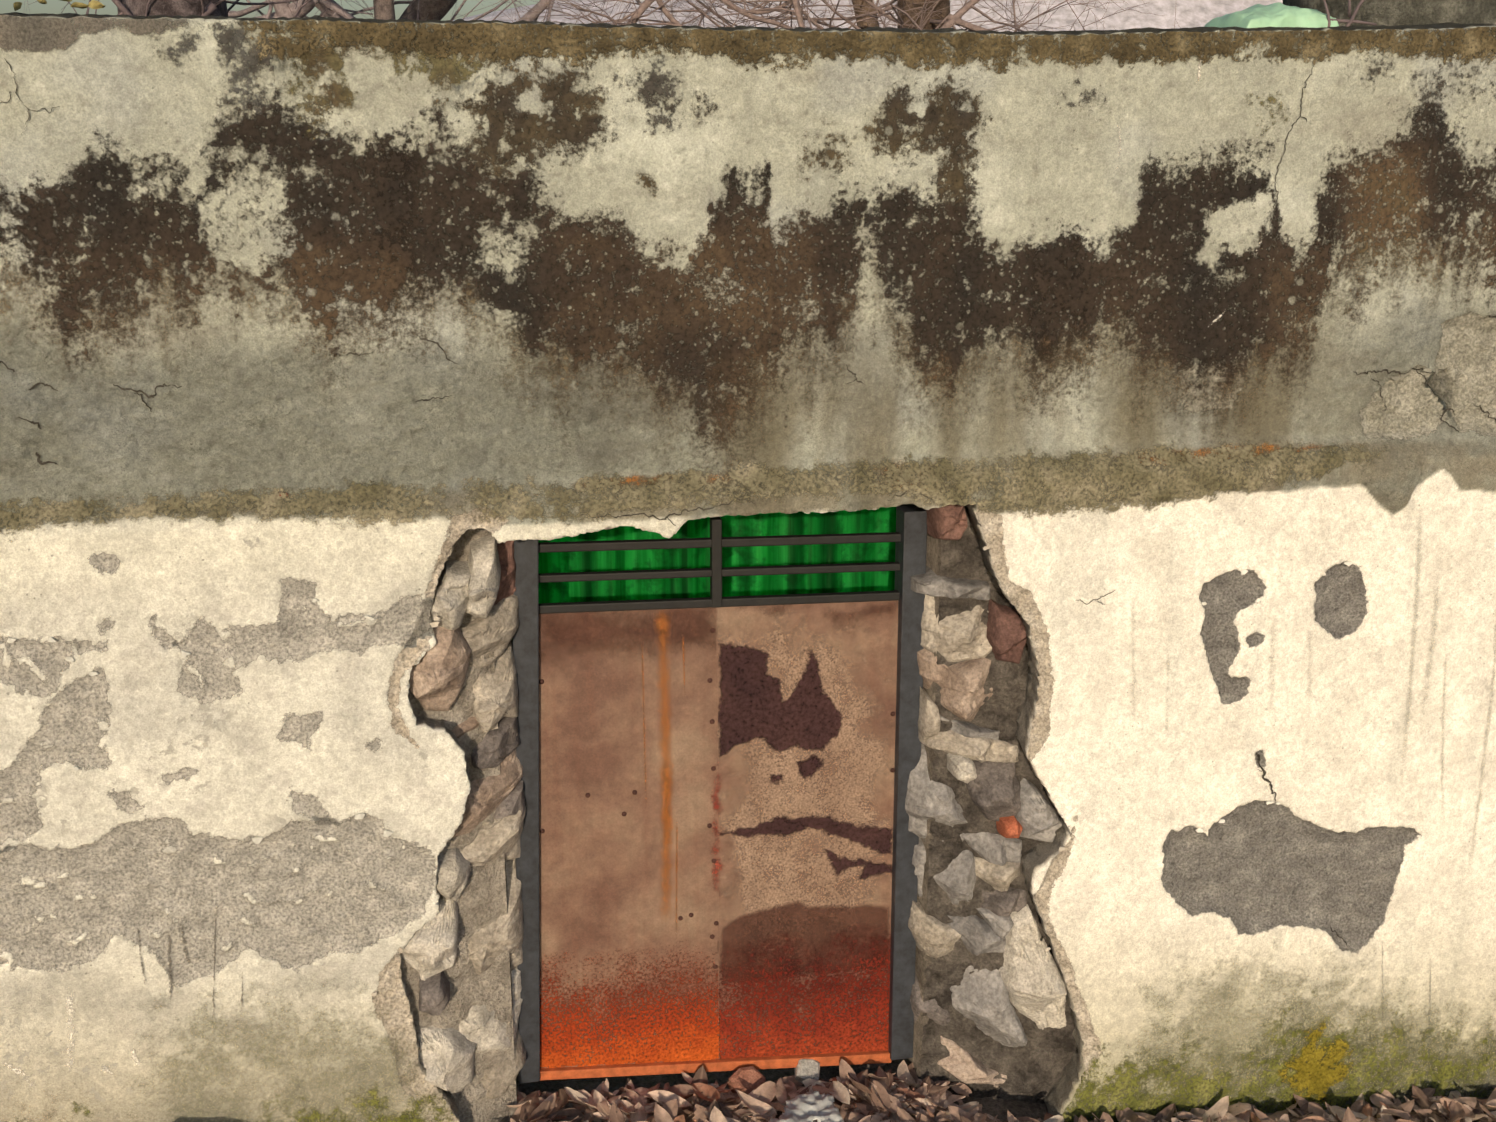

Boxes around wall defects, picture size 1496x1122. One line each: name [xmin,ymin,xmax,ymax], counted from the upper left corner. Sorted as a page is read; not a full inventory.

crack [1271,66,1314,273]
water stain [0,14,1496,486]
crack [1353,368,1496,432]
peeling [148,507,508,752]
spalling [1199,569,1266,704]
spalling [1314,561,1369,639]
peeling [718,644,842,785]
peeling [0,618,459,1122]
corrosion [712,777,722,882]
spalling [1161,800,1421,954]
corrosion [540,927,891,1068]
water stain [1141,971,1496,1094]